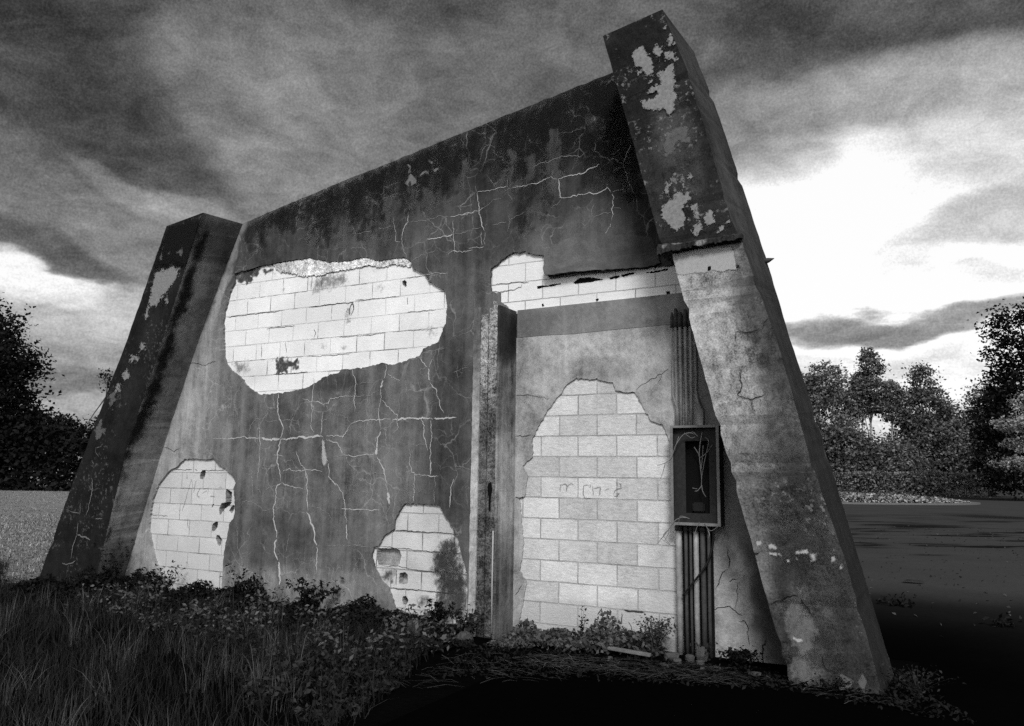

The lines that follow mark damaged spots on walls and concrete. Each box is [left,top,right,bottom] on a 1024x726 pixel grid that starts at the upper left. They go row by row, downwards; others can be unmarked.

peeling [632,25,690,157]
crack [353,144,633,275]
peeling [661,174,730,236]
spalling [225,257,447,395]
spalling [491,252,682,311]
spalling [151,459,236,591]
crack [214,360,468,585]
spalling [373,504,468,624]
spalling [519,378,677,638]
crack [714,551,766,662]